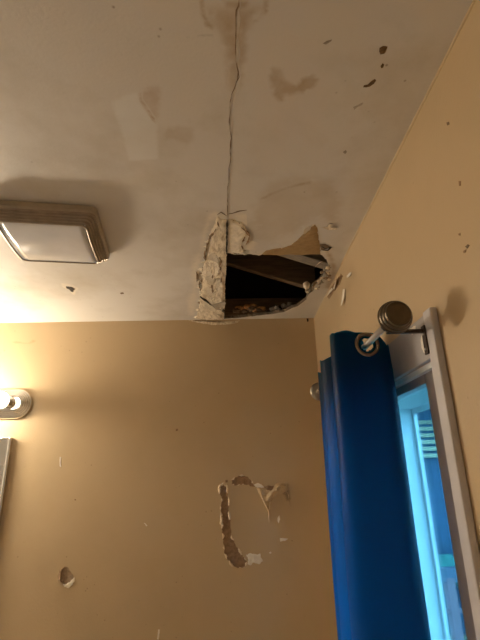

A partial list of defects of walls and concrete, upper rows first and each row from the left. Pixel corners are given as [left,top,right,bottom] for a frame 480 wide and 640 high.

crack [217,0,246,255]
damp [198,0,352,246]
peeling [184,210,260,320]
peeling [60,283,79,295]
peeling [327,272,352,305]
peeling [246,553,263,565]
spalling [58,567,75,588]